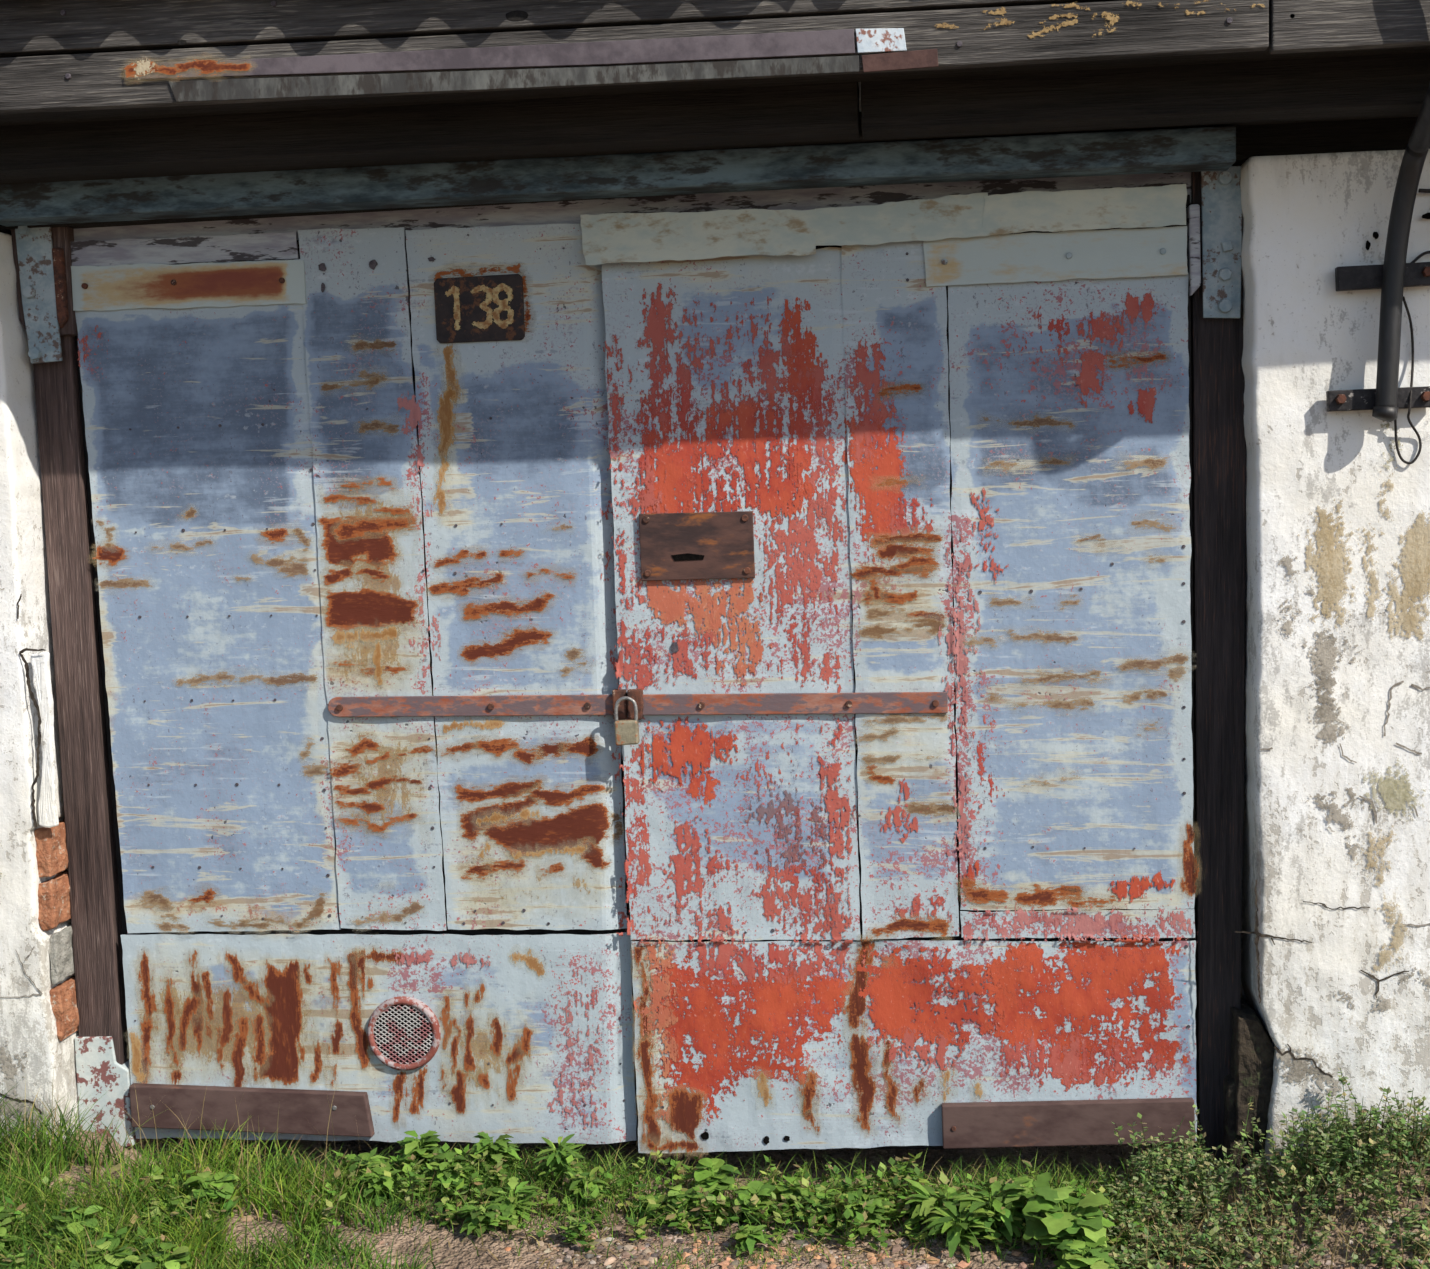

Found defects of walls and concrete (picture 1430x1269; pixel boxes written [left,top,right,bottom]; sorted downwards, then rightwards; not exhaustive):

rust [235,476,555,685]
peeling [535,278,1204,1133]
rust [850,531,946,641]
peeling [1276,554,1362,752]
crack [1384,681,1430,754]
rust [299,718,624,899]
peeling [1301,787,1365,860]
crack [1303,901,1370,910]
rust [129,947,401,1087]
rust [392,984,533,1123]
crack [1274,1044,1333,1078]
crack [1360,970,1409,998]